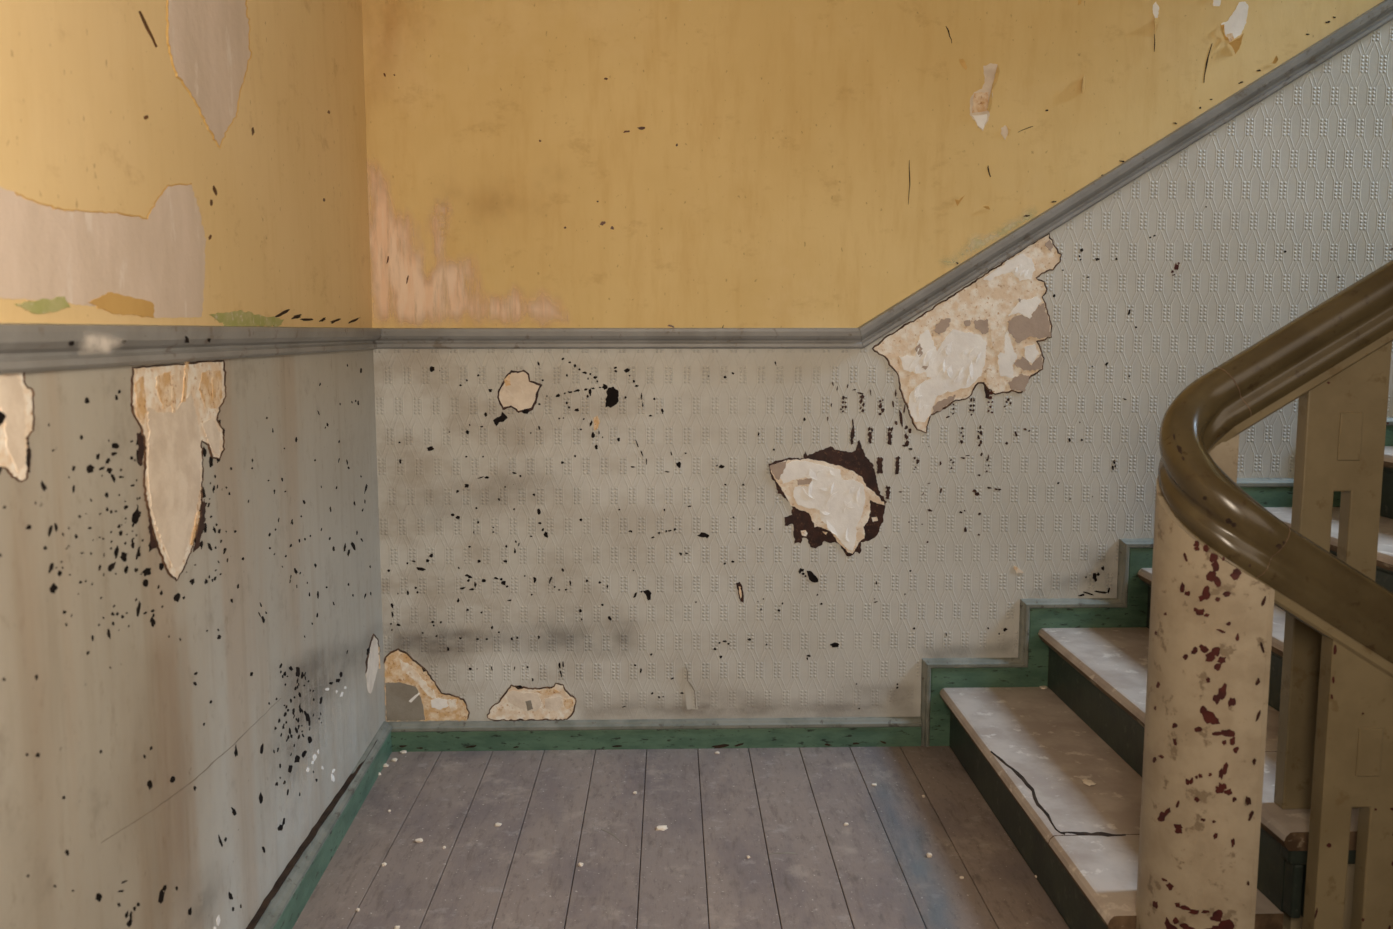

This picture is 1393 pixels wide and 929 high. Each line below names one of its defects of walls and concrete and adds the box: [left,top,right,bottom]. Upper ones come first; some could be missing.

peeling [166,0,252,148]
peeling [1213,0,1249,54]
peeling [369,169,560,323]
peeling [0,372,50,505]
peeling [43,360,244,655]
spalling [269,500,363,638]
peeling [365,554,433,694]
spalling [421,493,548,651]
spalling [449,358,664,468]
spalling [259,663,343,804]
crack [991,751,1126,837]
spalling [95,880,140,927]